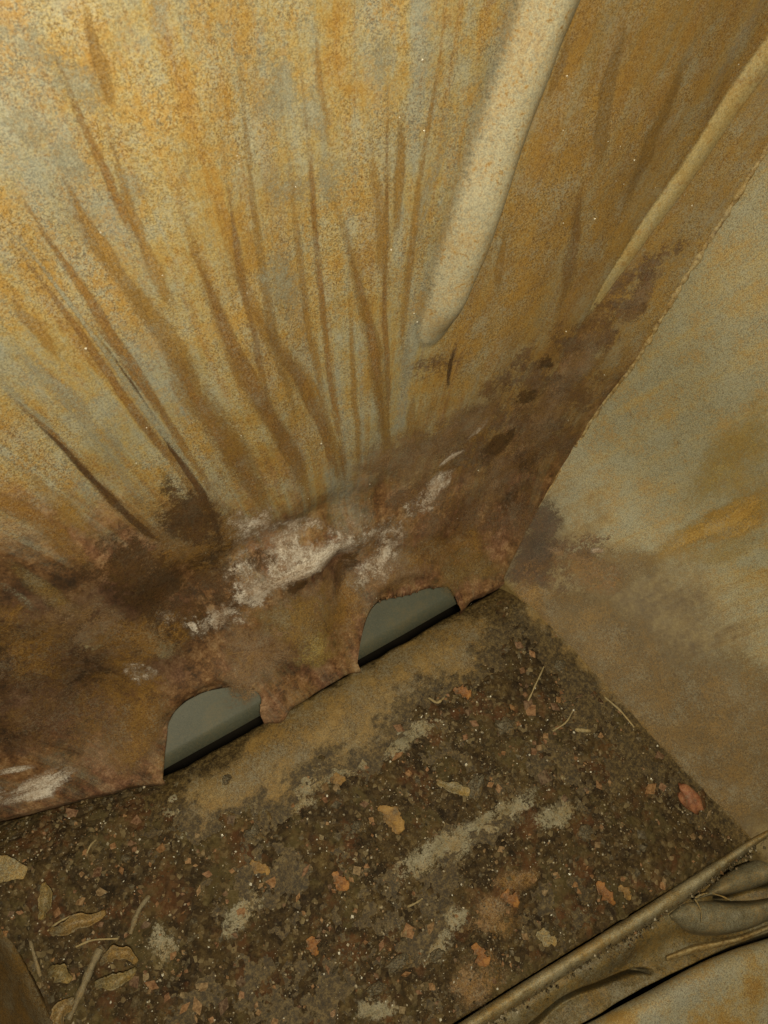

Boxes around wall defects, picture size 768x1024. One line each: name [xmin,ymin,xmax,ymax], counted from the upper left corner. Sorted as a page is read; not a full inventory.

corrosion [86,18,114,100]
corrosion [0,88,488,636]
corrosion [453,685,471,700]
corrosion [0,766,71,803]